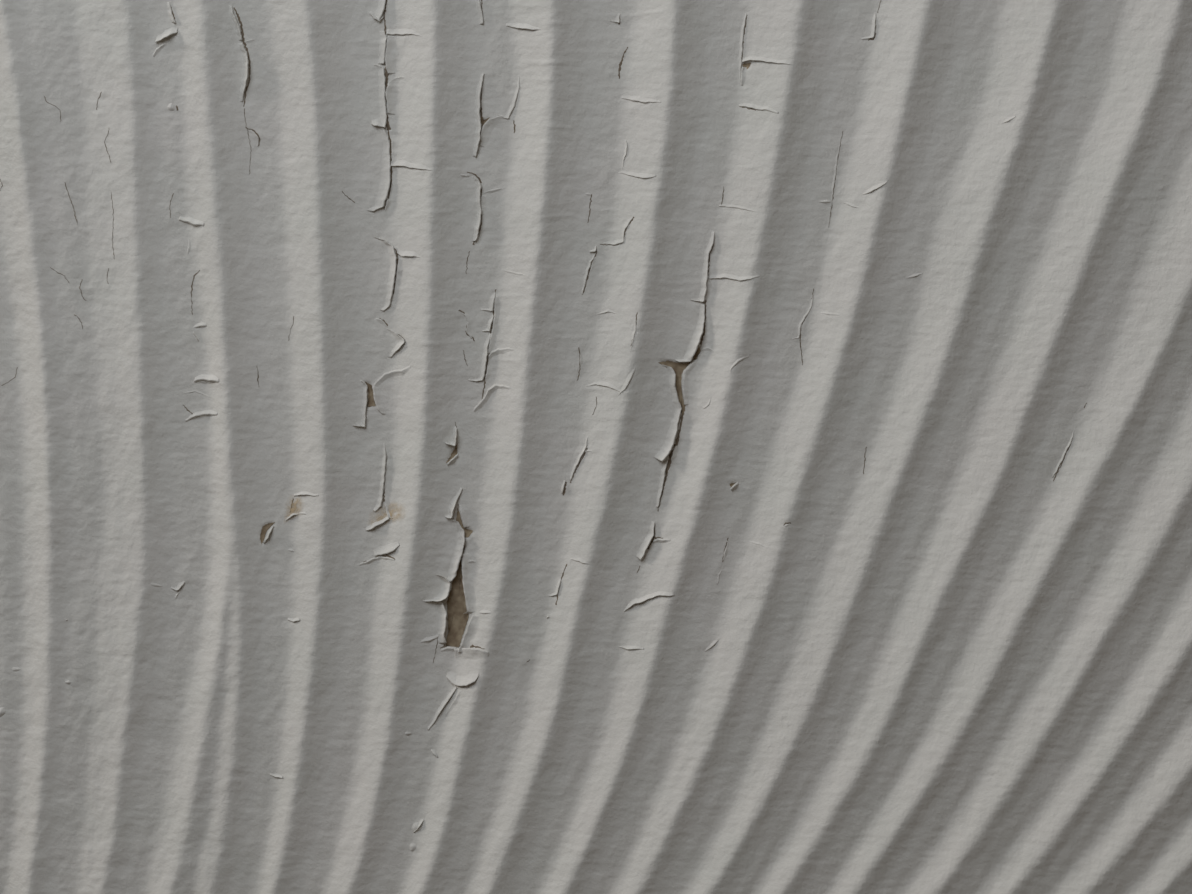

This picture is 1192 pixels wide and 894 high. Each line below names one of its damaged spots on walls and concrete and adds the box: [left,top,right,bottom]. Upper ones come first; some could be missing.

peeling [153,2,178,57]
peeling [365,443,394,531]
peeling [260,522,275,544]
peeling [359,542,400,566]
peeling [421,487,491,662]